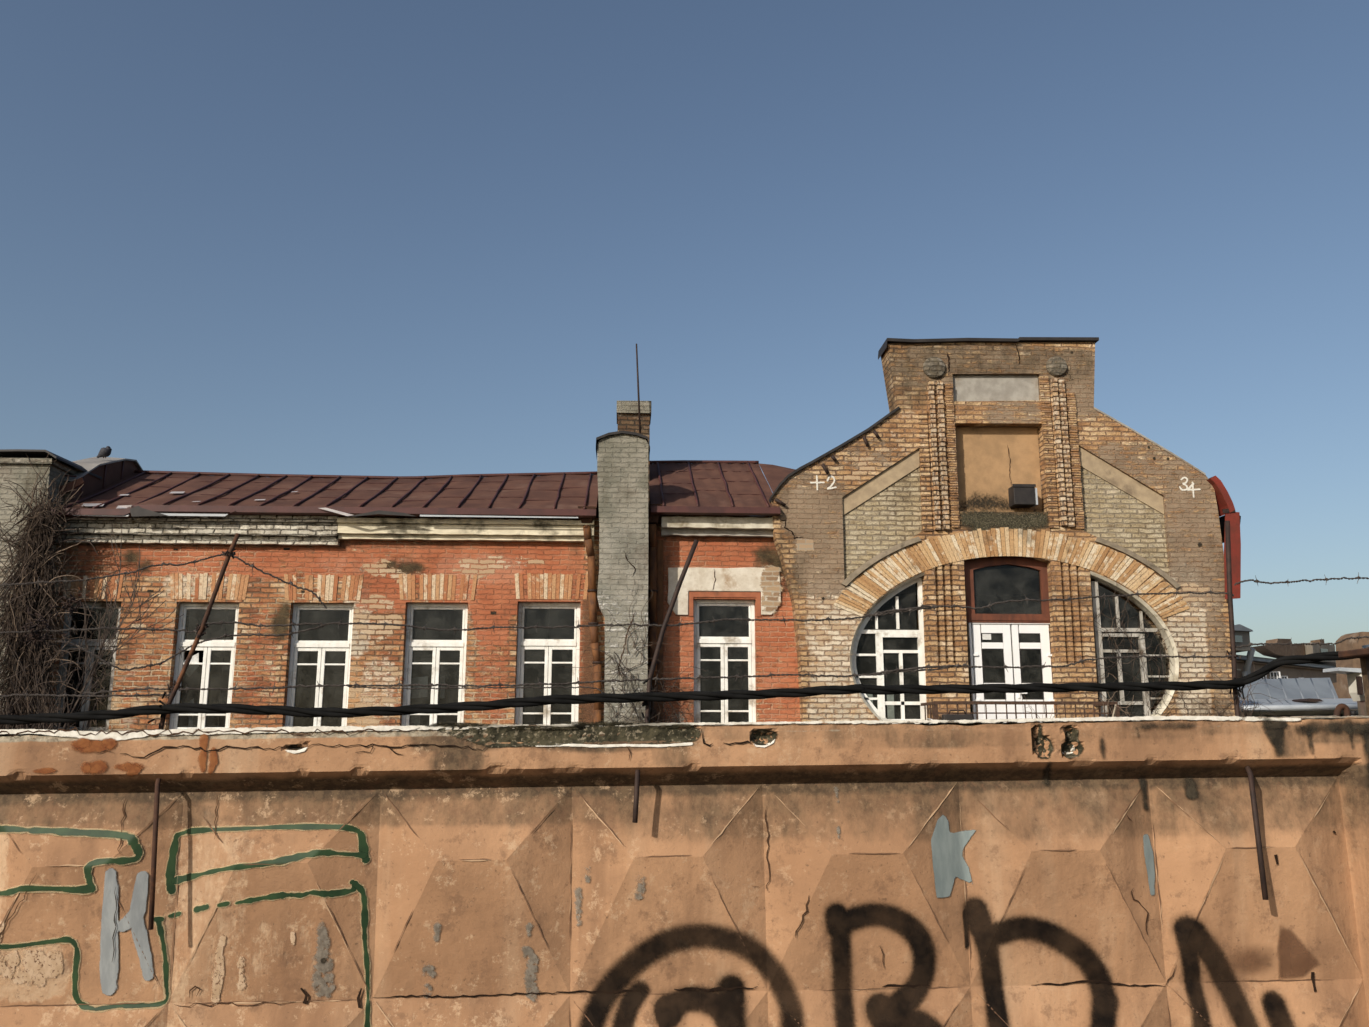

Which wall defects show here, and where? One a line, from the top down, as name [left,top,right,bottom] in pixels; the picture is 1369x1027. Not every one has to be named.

crack [0,727,491,758]
spalling [751,729,777,748]
spalling [1033,724,1084,759]
leakage [1263,718,1369,778]
crack [117,800,126,853]
crack [755,807,770,891]
crack [110,887,118,961]
crack [795,896,809,937]